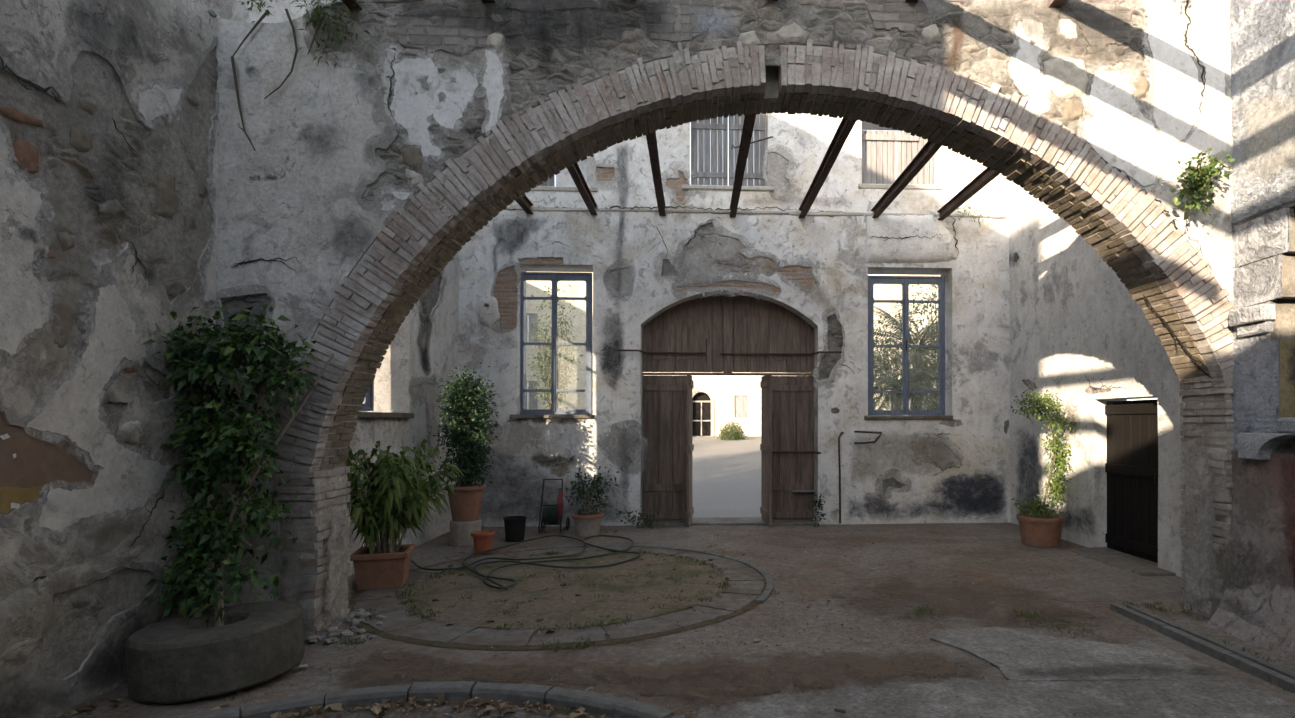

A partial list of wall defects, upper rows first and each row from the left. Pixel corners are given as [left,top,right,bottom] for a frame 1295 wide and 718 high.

crack [1183,0,1206,113]
spalling [303,0,1233,211]
spalling [0,36,275,544]
spalling [491,257,564,332]
spalling [655,220,820,298]
water stain [418,316,432,374]
spalling [813,309,845,388]
crack [130,477,174,547]
water stain [850,435,1094,533]